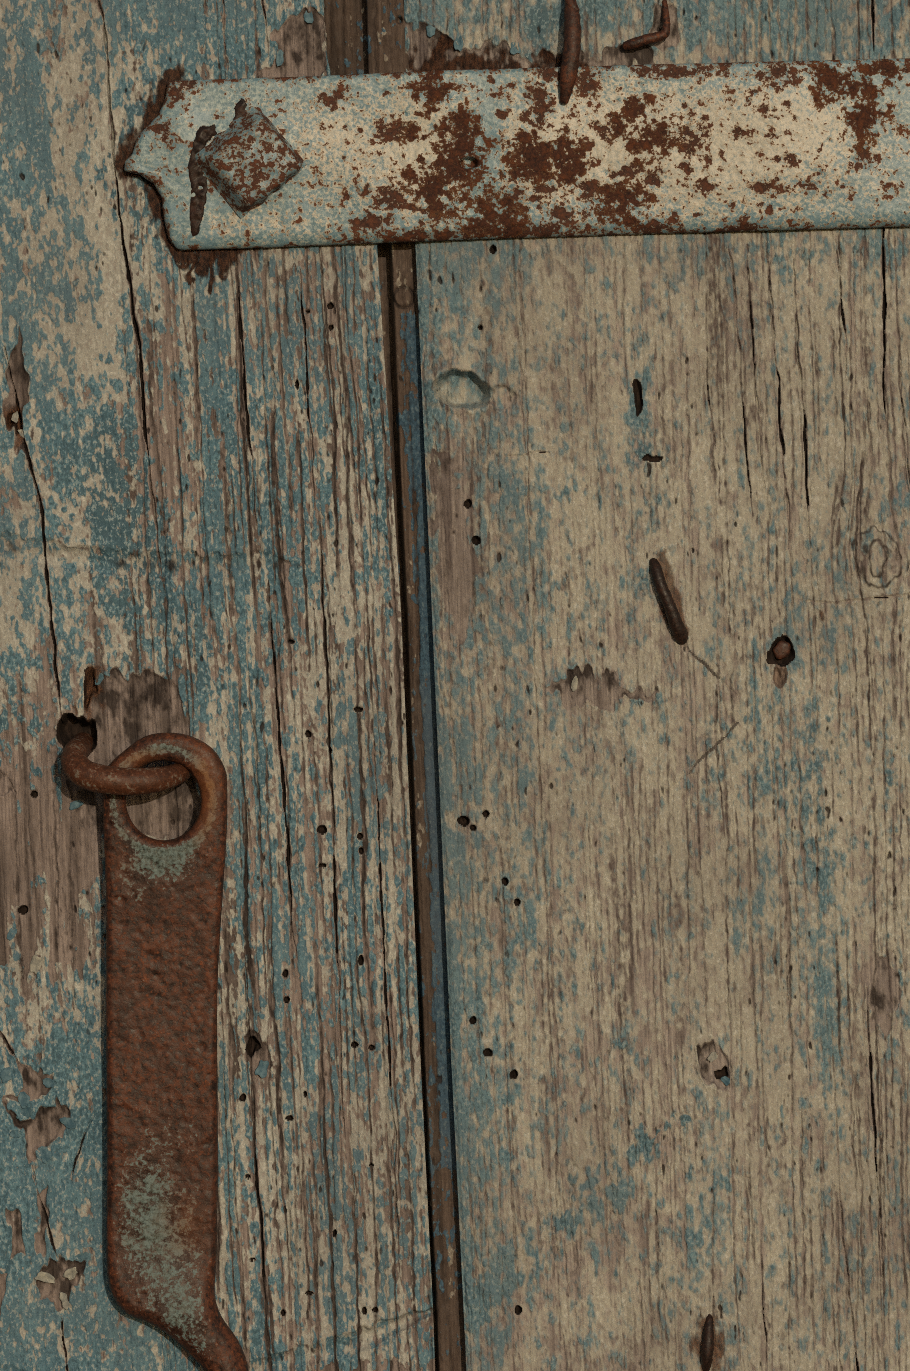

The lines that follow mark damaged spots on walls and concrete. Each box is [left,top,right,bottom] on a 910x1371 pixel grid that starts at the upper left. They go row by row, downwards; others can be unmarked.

corrosion [115,65,260,294]
peeling [258,7,327,78]
corrosion [391,35,587,239]
corrosion [591,92,686,229]
corrosion [808,59,910,152]
crack [116,177,149,455]
crack [15,390,61,705]
spalling [83,666,104,707]
peeling [0,727,103,985]
peeling [0,1058,76,1165]
peeling [0,1185,89,1313]